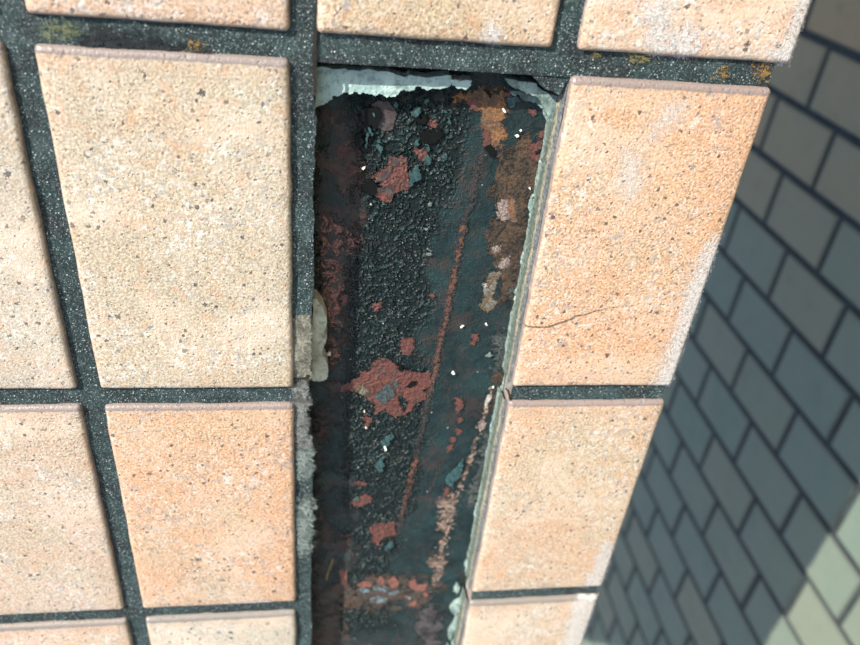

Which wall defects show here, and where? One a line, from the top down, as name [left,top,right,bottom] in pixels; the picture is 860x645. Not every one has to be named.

peeling [355,98,451,203]
corrosion [452,86,539,313]
crack [522,305,633,328]
peeling [289,314,316,481]
peeling [295,494,317,558]
peeling [350,481,373,508]
peeling [369,521,398,551]
peeling [375,433,394,472]
peeling [340,337,432,429]
corrosion [311,105,495,645]
peeling [443,459,464,496]
peeling [446,397,464,452]